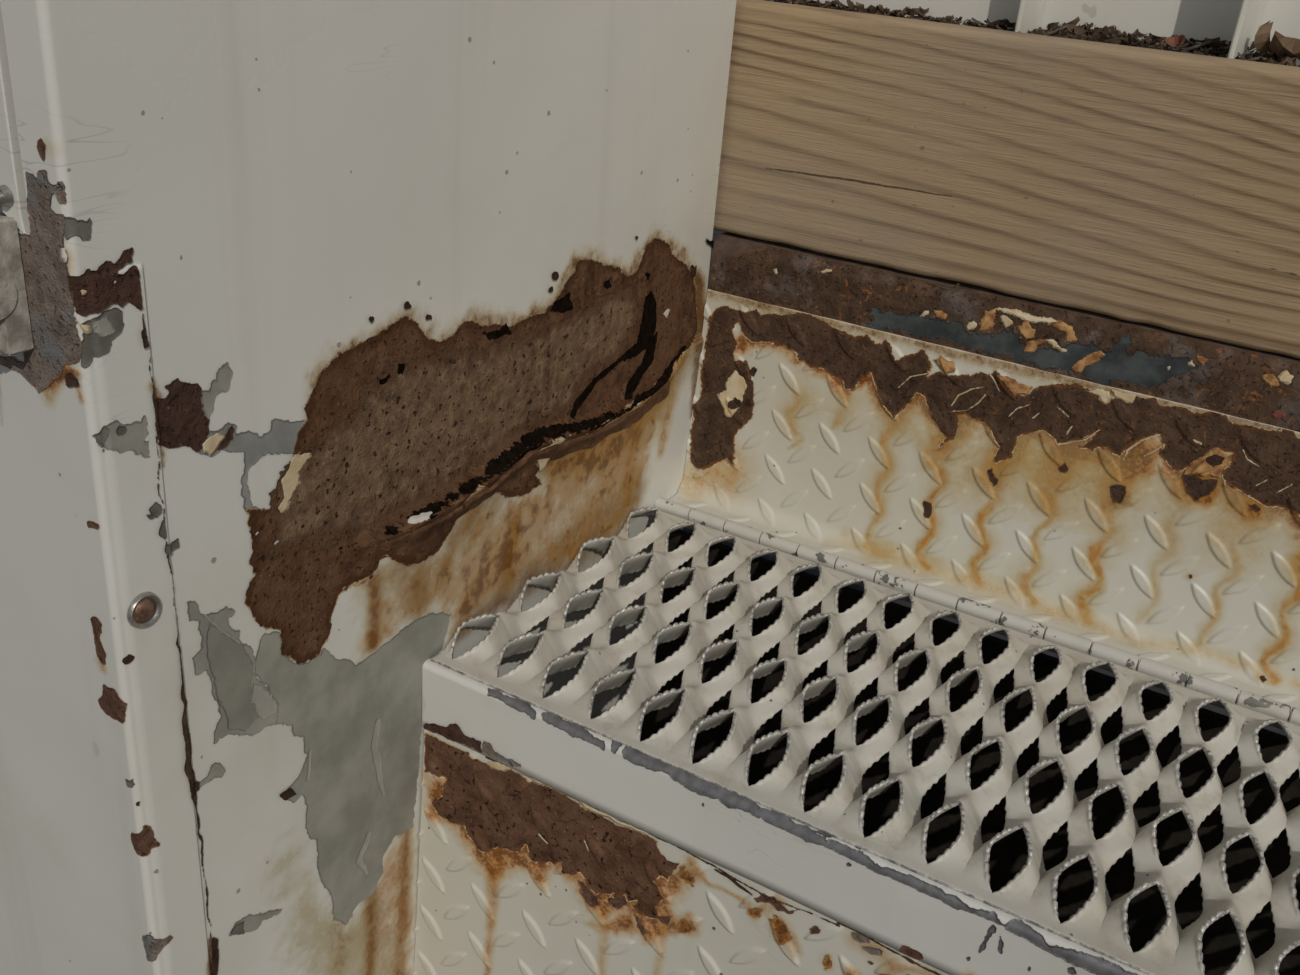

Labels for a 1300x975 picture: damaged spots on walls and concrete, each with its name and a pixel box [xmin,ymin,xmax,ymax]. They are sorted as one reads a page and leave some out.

peeling [63,217,92,241]
peeling [73,307,124,368]
peeling [92,415,150,458]
peeling [199,418,305,509]
rust [244,232,1300,684]
crack [141,314,219,975]
peeling [187,601,521,925]
rust [423,732,696,941]
rust [748,908,792,945]